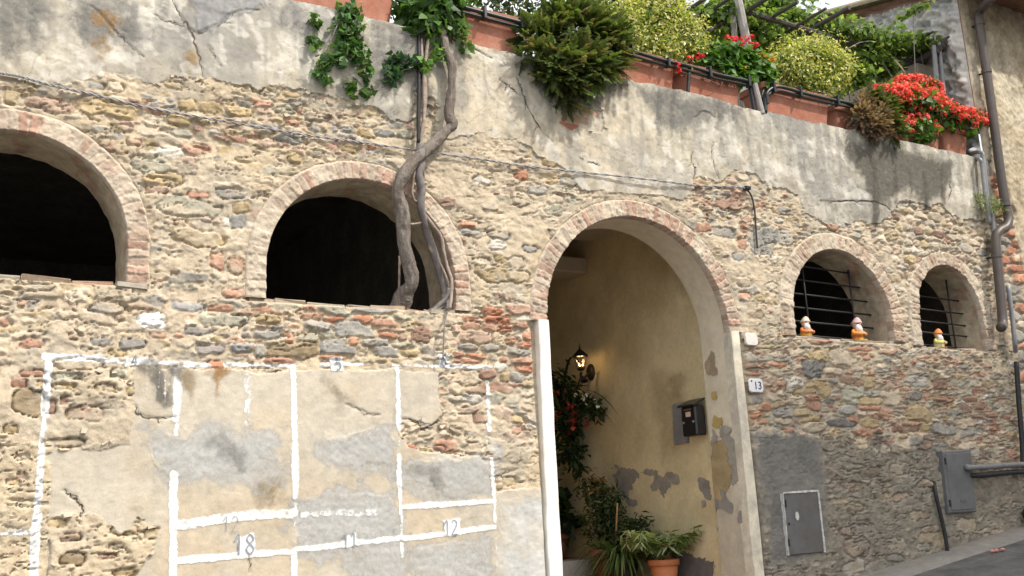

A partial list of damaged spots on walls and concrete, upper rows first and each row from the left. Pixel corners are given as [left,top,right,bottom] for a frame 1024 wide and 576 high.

crack [154,0,258,76]
spalling [92,74,367,121]
spalling [411,88,441,130]
crack [452,39,550,138]
spalling [561,105,608,133]
crack [821,200,890,210]
water stain [139,362,192,406]
peeling [704,351,718,376]
peeling [613,465,680,507]
peeling [698,415,742,523]